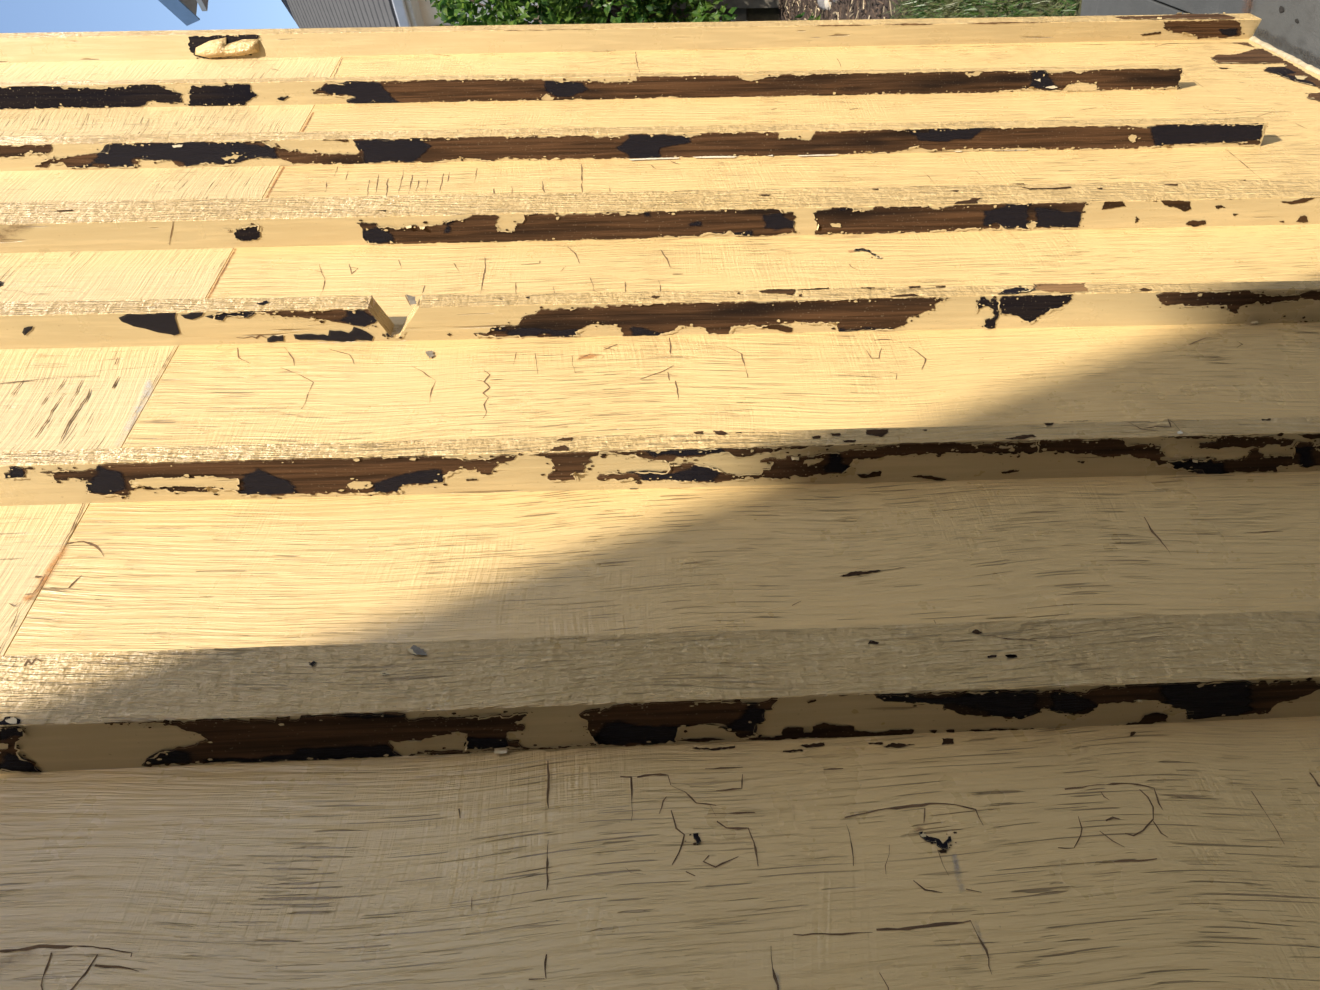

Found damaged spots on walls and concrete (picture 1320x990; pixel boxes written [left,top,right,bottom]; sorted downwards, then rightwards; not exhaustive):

peeling [0,83,257,110]
peeling [312,68,1183,104]
peeling [0,123,1268,169]
peeling [357,194,797,245]
peeling [473,286,948,339]
peeling [4,418,1320,499]
crack [544,761,552,808]
crack [620,767,758,876]
crack [1058,783,1167,862]
crack [543,845,551,890]
crack [771,803,992,990]
crack [529,954,547,980]